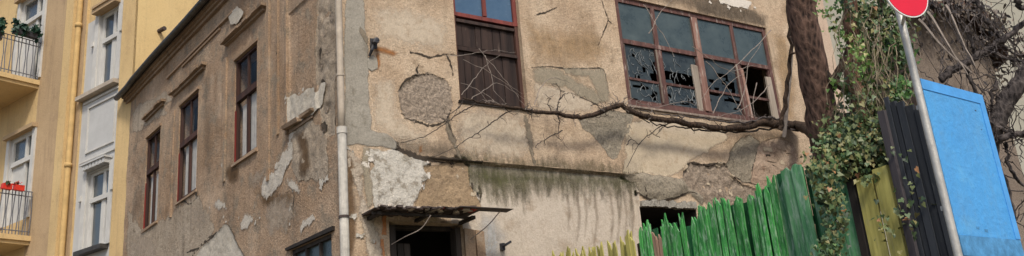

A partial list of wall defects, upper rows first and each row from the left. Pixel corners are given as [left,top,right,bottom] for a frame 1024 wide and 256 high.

crack [532,1,611,93]
flaking render [197,0,336,256]
peeling [347,72,528,256]
crack [396,51,483,202]
damp [463,159,637,196]
flaking render [535,83,634,159]
flaking render [683,135,798,208]